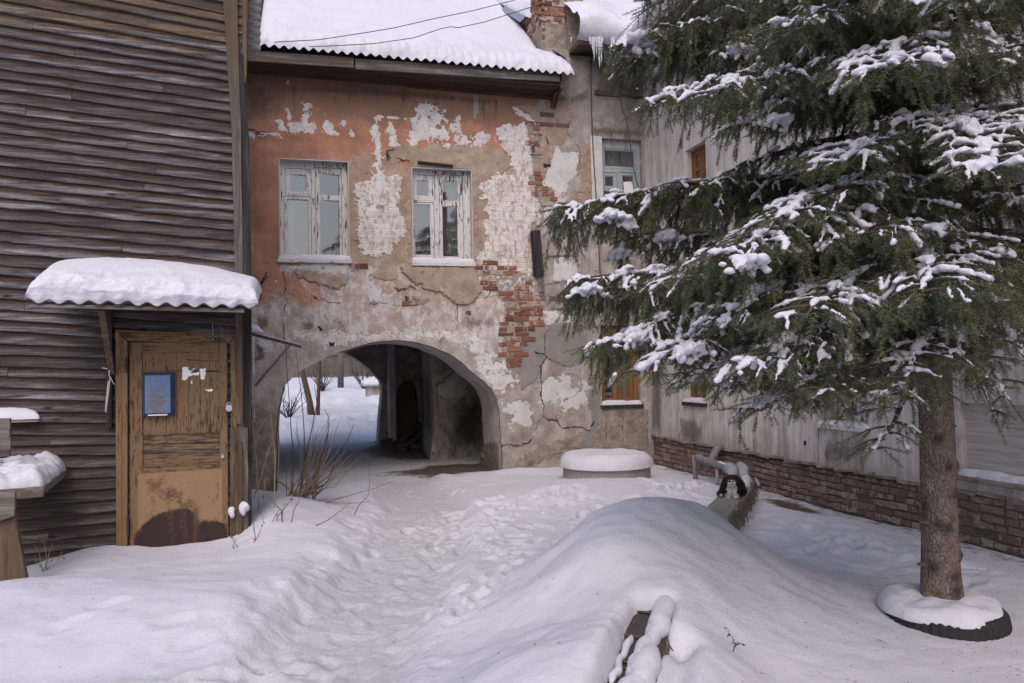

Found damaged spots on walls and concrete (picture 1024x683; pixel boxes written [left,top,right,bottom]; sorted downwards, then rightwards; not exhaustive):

peeling [248,99,592,432]
crack [501,329,638,465]